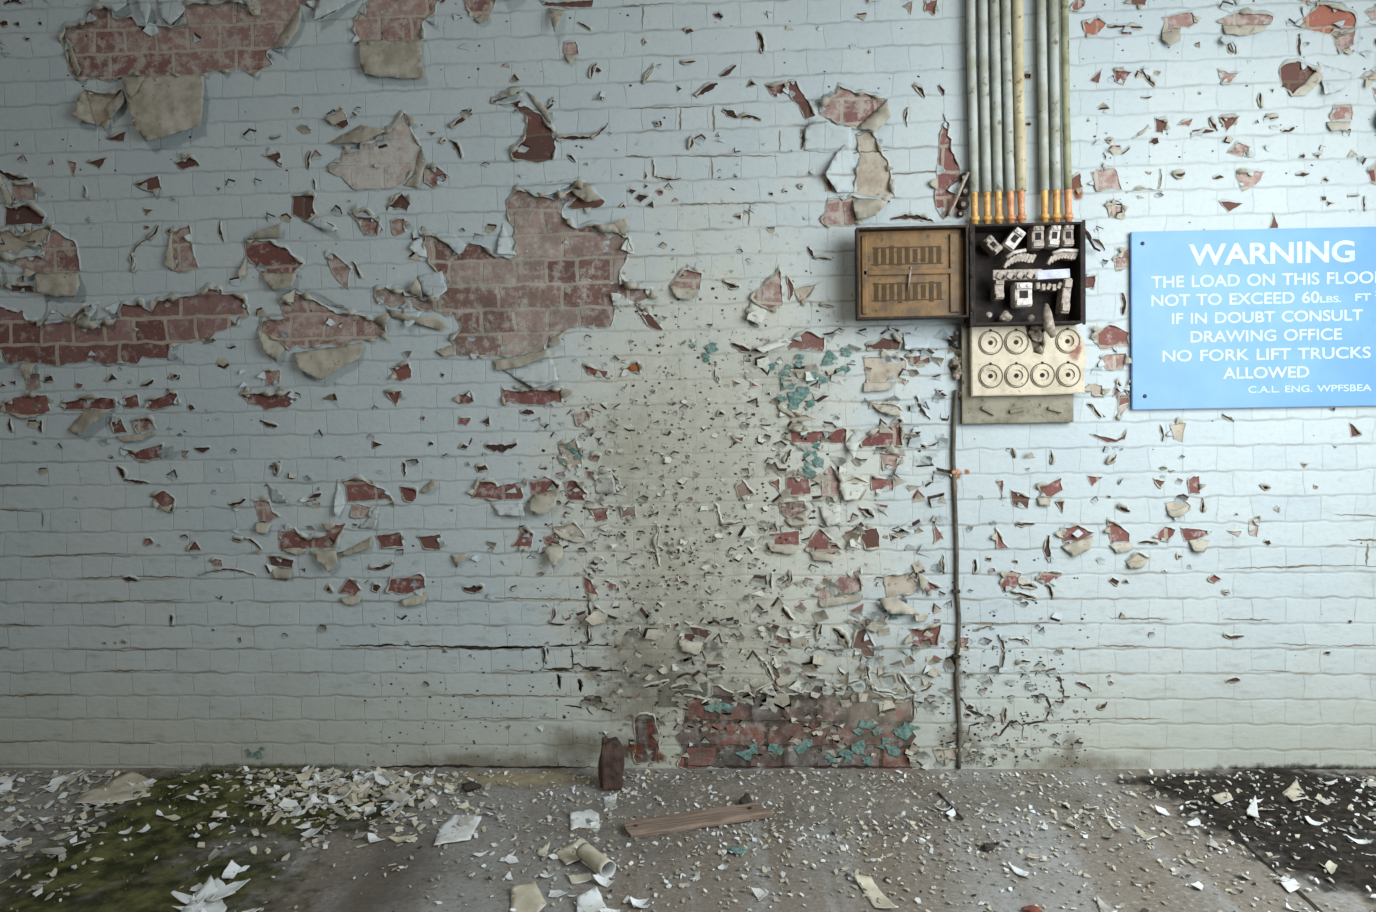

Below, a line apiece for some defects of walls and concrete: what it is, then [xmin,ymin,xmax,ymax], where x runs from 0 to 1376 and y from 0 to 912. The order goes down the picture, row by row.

peeling [48,0,508,178]
peeling [540,0,594,64]
peeling [1069,0,1163,233]
peeling [0,48,1297,770]
peeling [1333,422,1363,449]